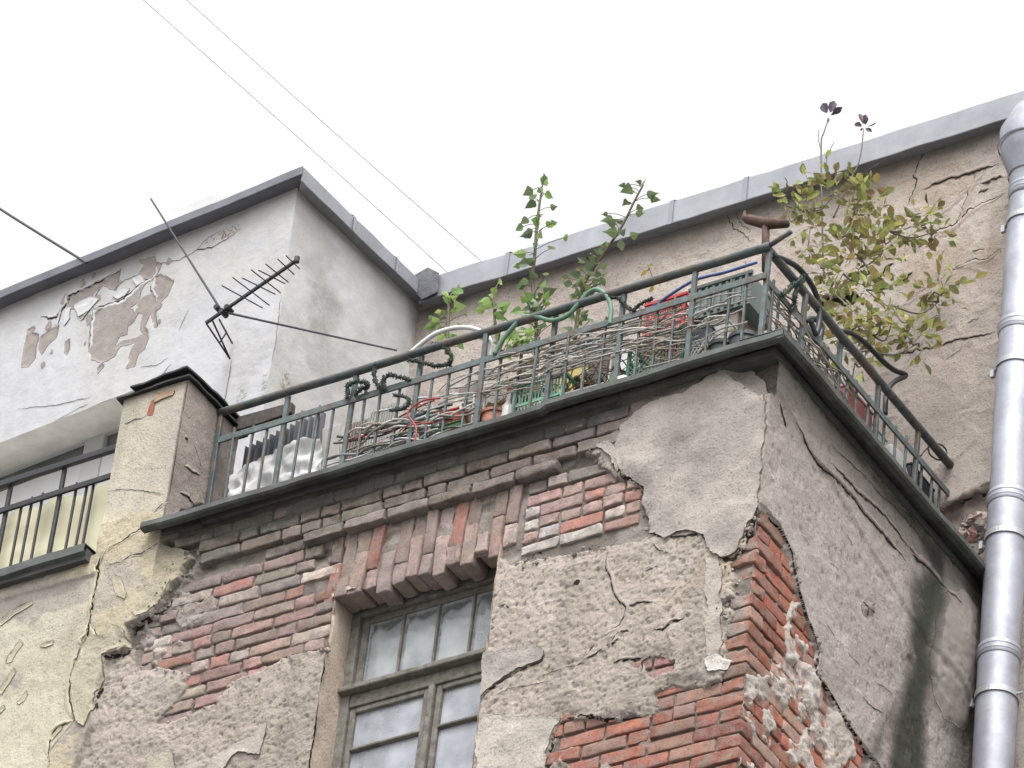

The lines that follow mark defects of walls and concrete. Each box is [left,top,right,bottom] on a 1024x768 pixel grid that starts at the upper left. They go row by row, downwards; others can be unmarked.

crack [908,152,1005,248]
peeling [21,253,174,373]
spalling [147,390,175,415]
crack [900,315,995,358]
peeling [0,640,23,714]
crack [43,435,201,758]
spalling [70,540,341,726]
crack [483,548,683,697]
spalling [475,370,880,768]
crack [780,404,962,603]
damp [891,545,945,768]
spalling [940,493,987,562]